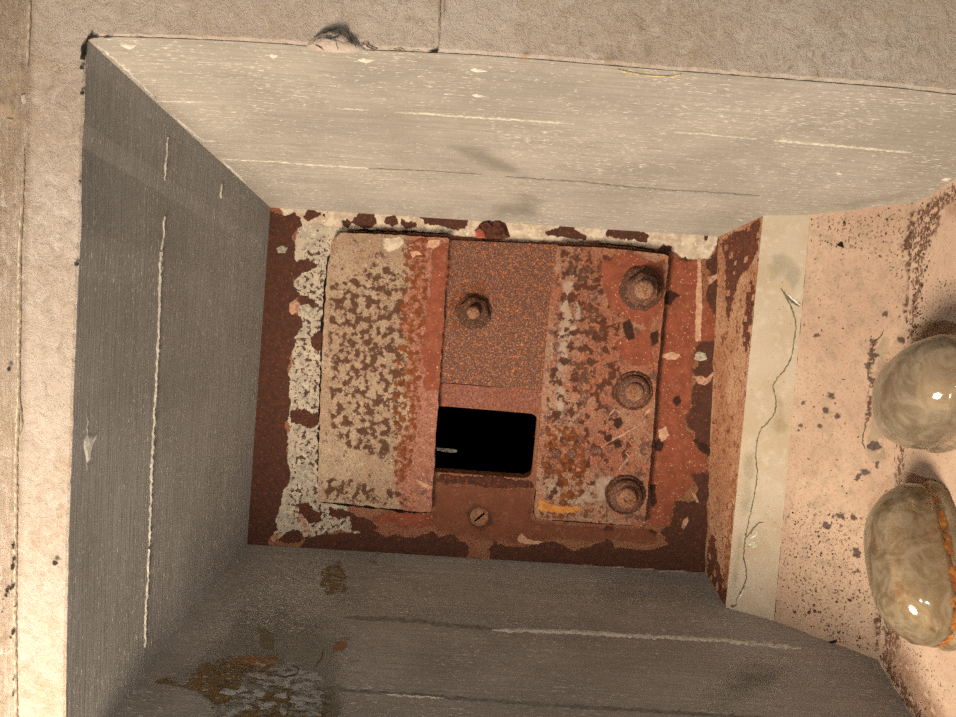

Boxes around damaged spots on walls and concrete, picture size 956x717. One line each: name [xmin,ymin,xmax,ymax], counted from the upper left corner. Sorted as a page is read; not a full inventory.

rust [545,226,587,240]
rust [704,220,760,352]
rust [247,210,510,558]
rust [538,230,689,520]
rust [686,340,714,447]
crack [730,288,801,608]
peeling [155,561,348,717]
rust [489,471,737,605]
rust [885,482,956,717]